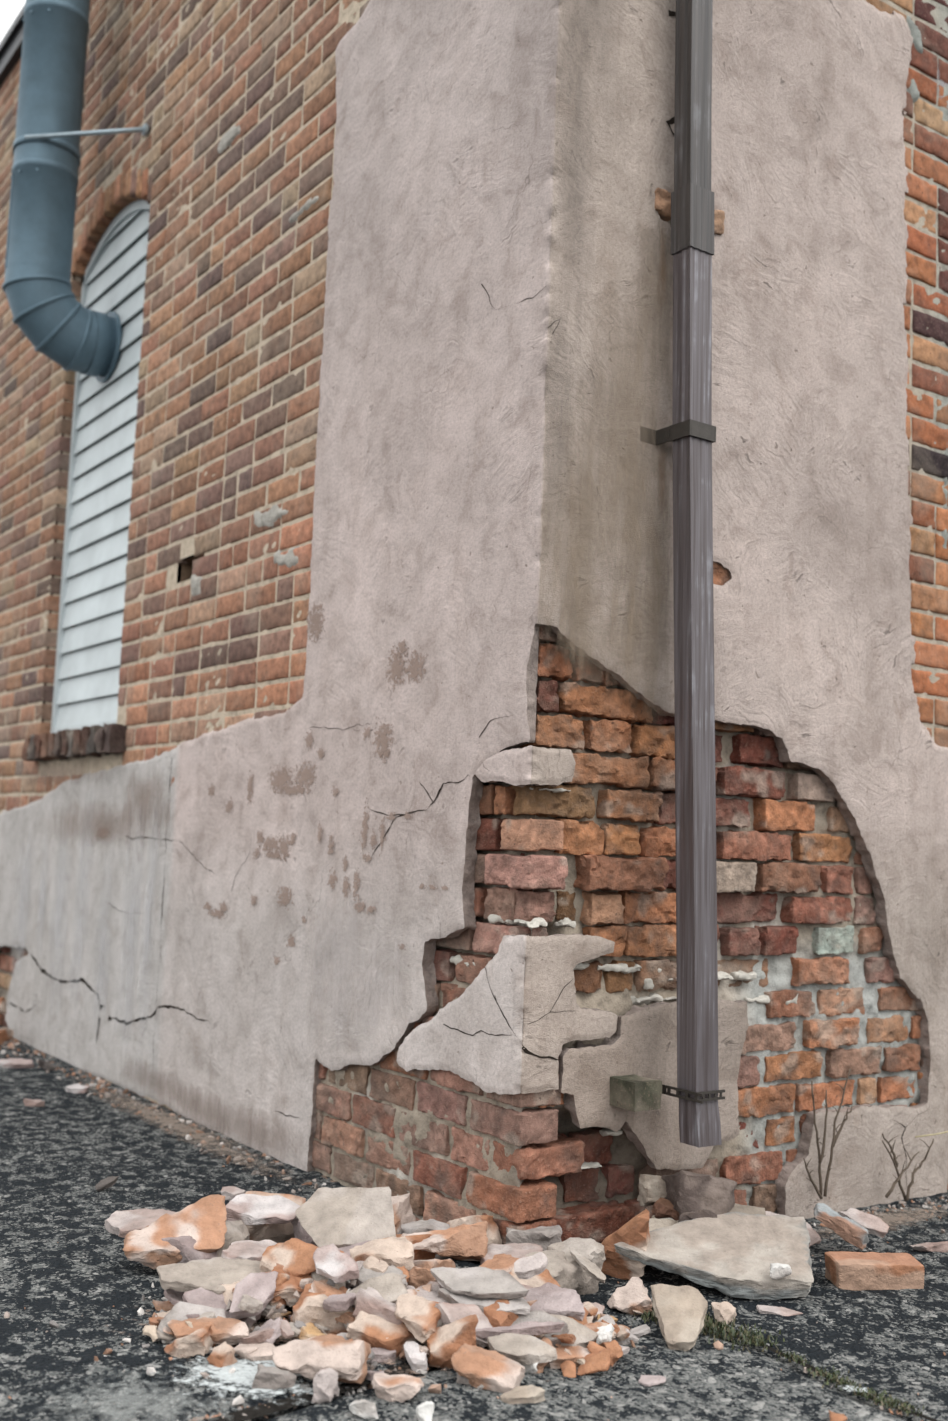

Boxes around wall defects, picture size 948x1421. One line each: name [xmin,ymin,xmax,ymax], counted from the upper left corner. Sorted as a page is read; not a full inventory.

crack [369,775,468,863]
crack [10,758,251,1091]
spalling [0,946,28,1045]
crack [443,968,573,1060]
spalling [143,625,924,1404]
spalling [122,1194,227,1270]